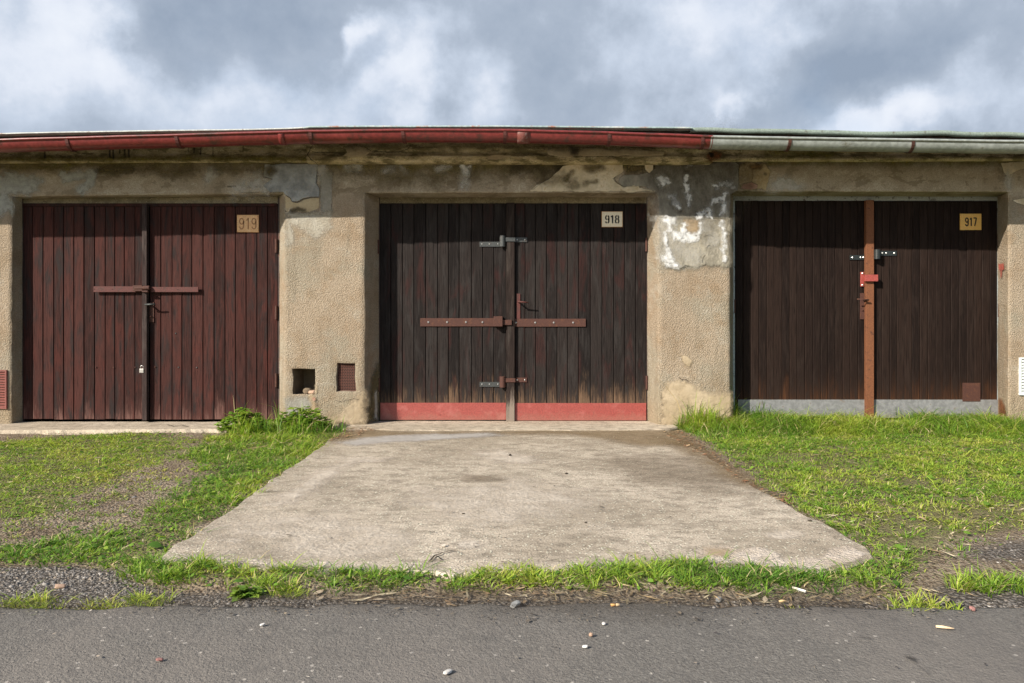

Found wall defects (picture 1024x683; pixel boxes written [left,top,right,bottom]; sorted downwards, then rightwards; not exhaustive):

peeling [263,163,324,213]
damp [337,366,701,454]